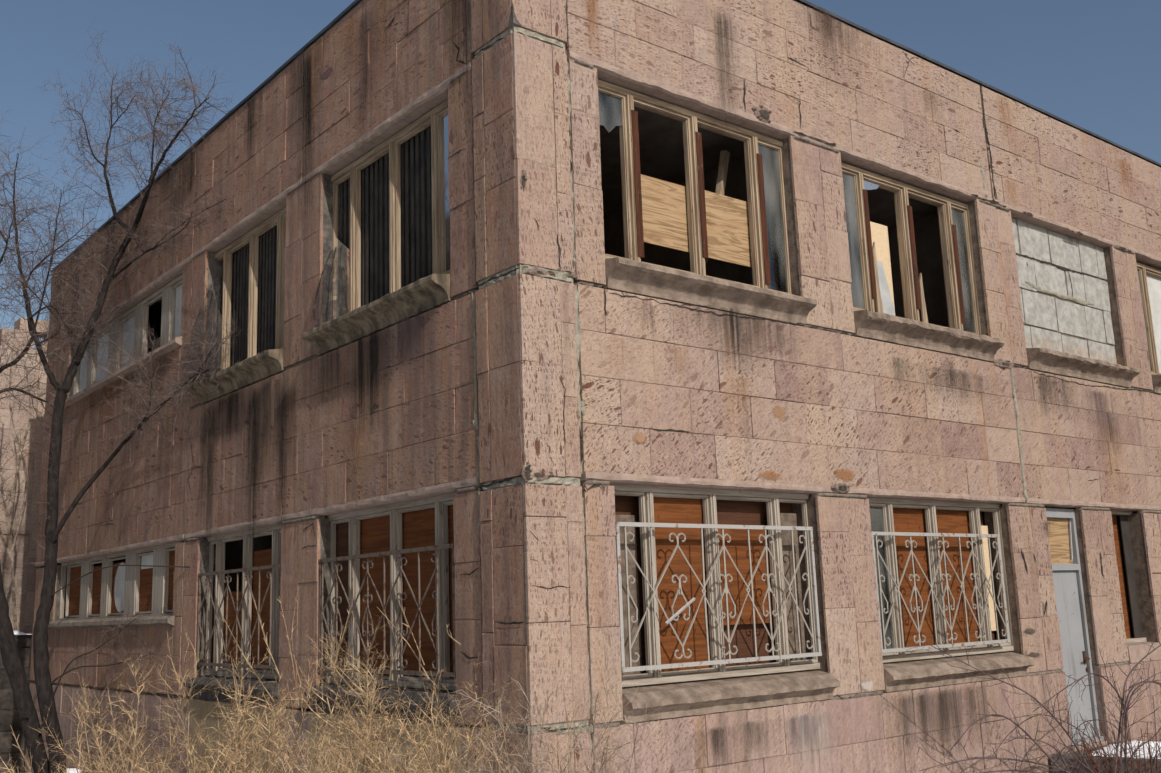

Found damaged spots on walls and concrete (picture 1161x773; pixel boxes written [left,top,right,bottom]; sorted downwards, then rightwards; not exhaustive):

crack [543,724,585,732]